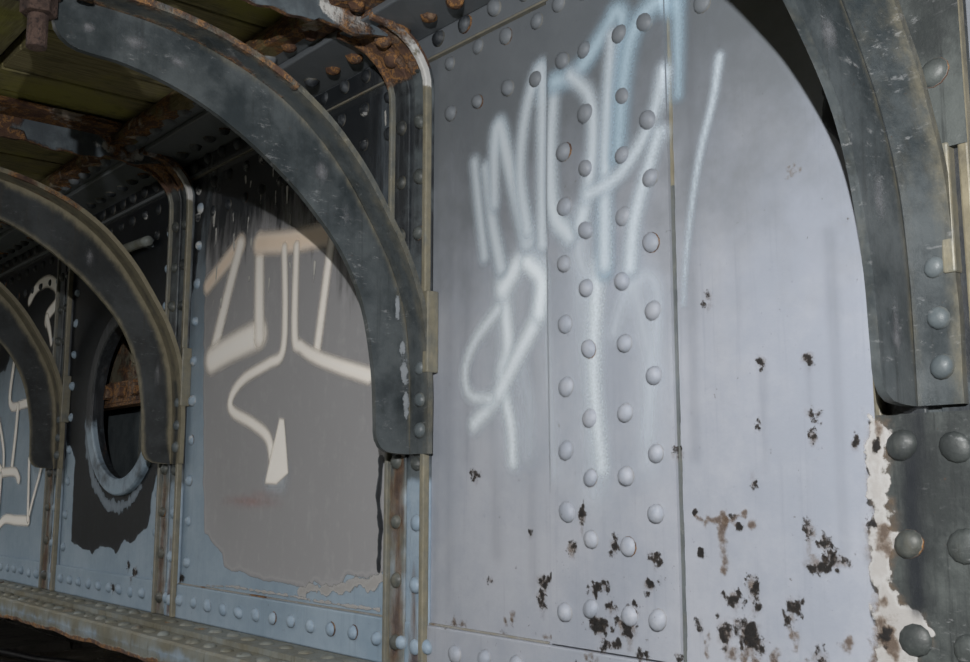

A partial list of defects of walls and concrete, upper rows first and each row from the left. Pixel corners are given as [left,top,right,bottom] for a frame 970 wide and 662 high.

leakage [375,455,384,573]
rust [391,463,403,530]
rust [536,572,552,609]
rust [575,577,659,662]
rust [648,551,663,567]
rust [692,509,756,575]
rust [715,572,777,662]
rust [782,599,805,647]
rust [802,518,851,577]
peeling [864,414,935,662]